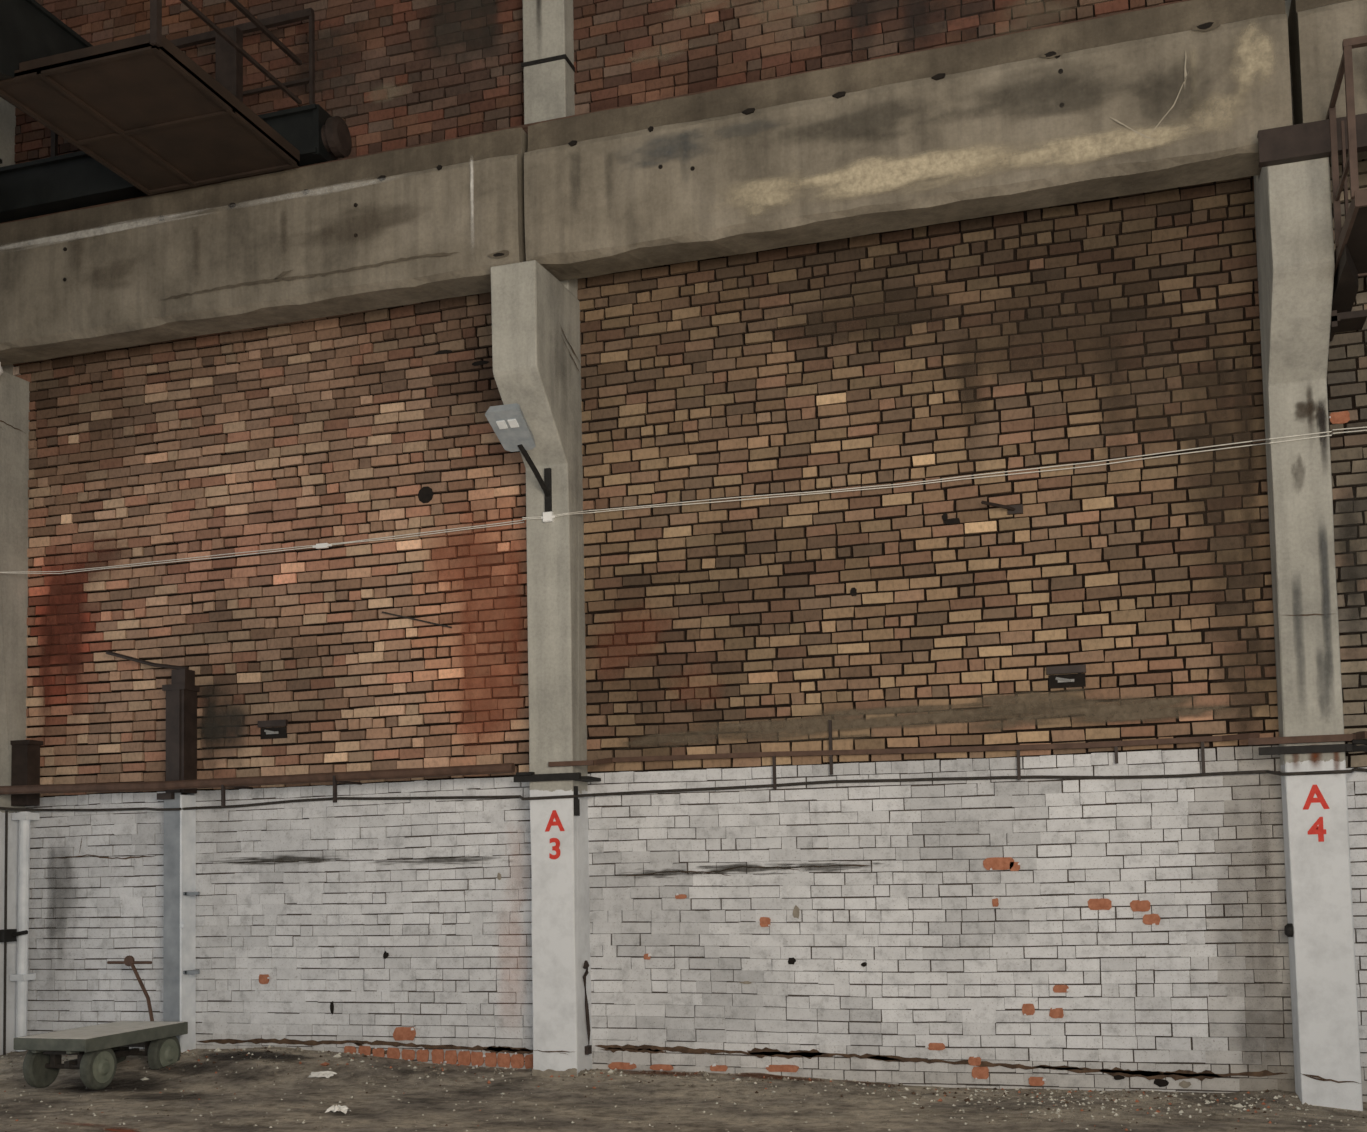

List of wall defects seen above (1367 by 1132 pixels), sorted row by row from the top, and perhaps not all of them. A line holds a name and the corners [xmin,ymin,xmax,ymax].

water stain [1297,392,1327,449]
water stain [1319,531,1330,662]
crack [629,865,870,876]
peeling [983,857,1020,871]
peeling [1088,897,1112,910]
peeling [1130,898,1161,926]
peeling [1022,985,1071,1018]
peeling [344,1027,591,1077]
peeling [608,1062,673,1071]
crack [197,1038,1361,1084]
peeling [925,1043,945,1051]
peeling [968,1056,989,1079]